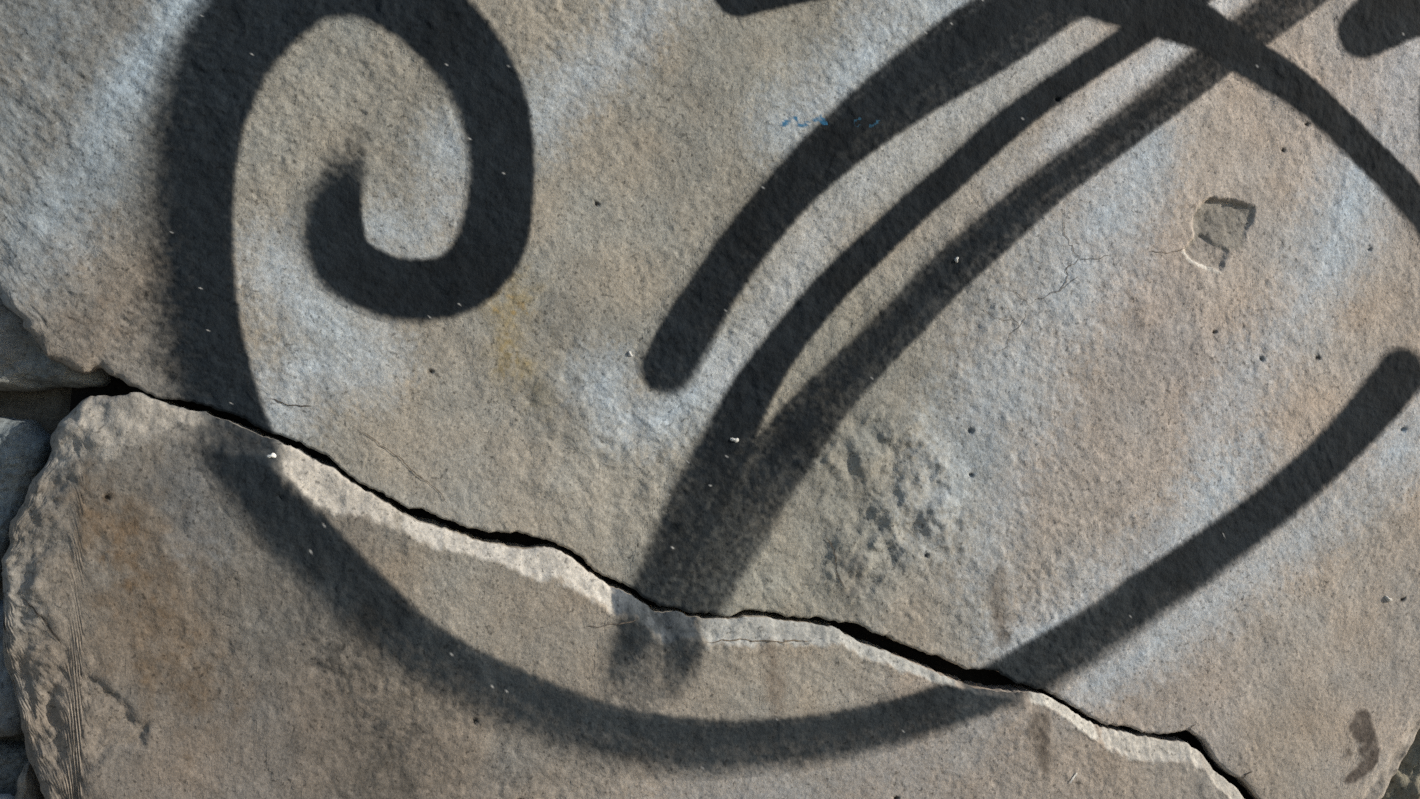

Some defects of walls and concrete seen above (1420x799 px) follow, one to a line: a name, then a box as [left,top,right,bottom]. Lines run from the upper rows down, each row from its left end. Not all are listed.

flaking render [1181,196,1257,277]
crack [69,376,688,628]
crack [707,535,1253,799]